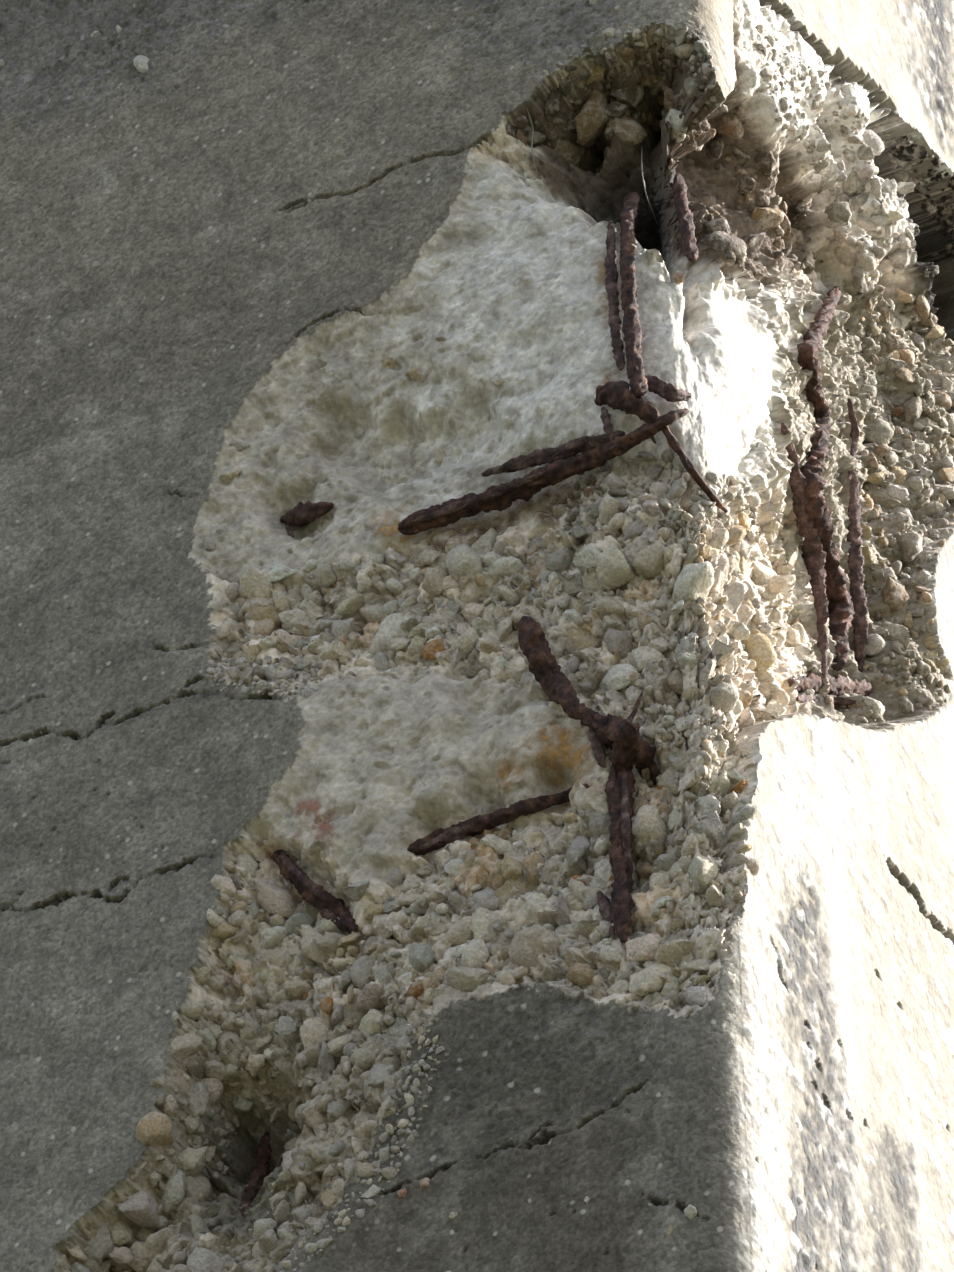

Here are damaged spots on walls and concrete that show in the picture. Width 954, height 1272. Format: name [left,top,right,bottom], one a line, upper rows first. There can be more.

crack [278,134,486,215]
corrosion [645,375,692,402]
corrosion [378,407,625,550]
spalling [186,0,954,1023]
corrosion [781,422,829,678]
corrosion [847,398,869,672]
crack [0,641,288,766]
crack [0,853,217,913]
spalling [803,1019,869,1129]
spalling [261,1030,445,1272]
crack [373,1079,648,1199]
spalling [684,1204,698,1220]